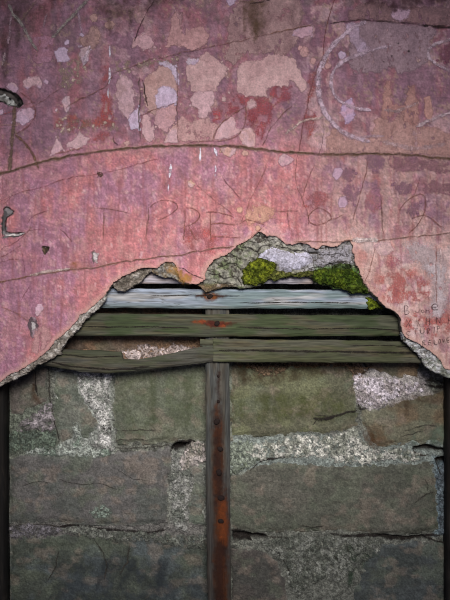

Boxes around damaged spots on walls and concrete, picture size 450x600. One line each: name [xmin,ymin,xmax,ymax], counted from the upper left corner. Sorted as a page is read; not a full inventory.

crack [0,0,450,219]
crack [0,246,234,283]
flaking render [113,262,185,292]
flaking render [197,205,450,378]
flaking render [0,292,108,387]
spalling [122,343,194,359]
spalling [338,363,425,408]
spalling [9,372,114,458]
crack [314,404,366,424]
spalling [230,427,420,476]
rust [213,405,228,600]
crack [300,525,444,560]